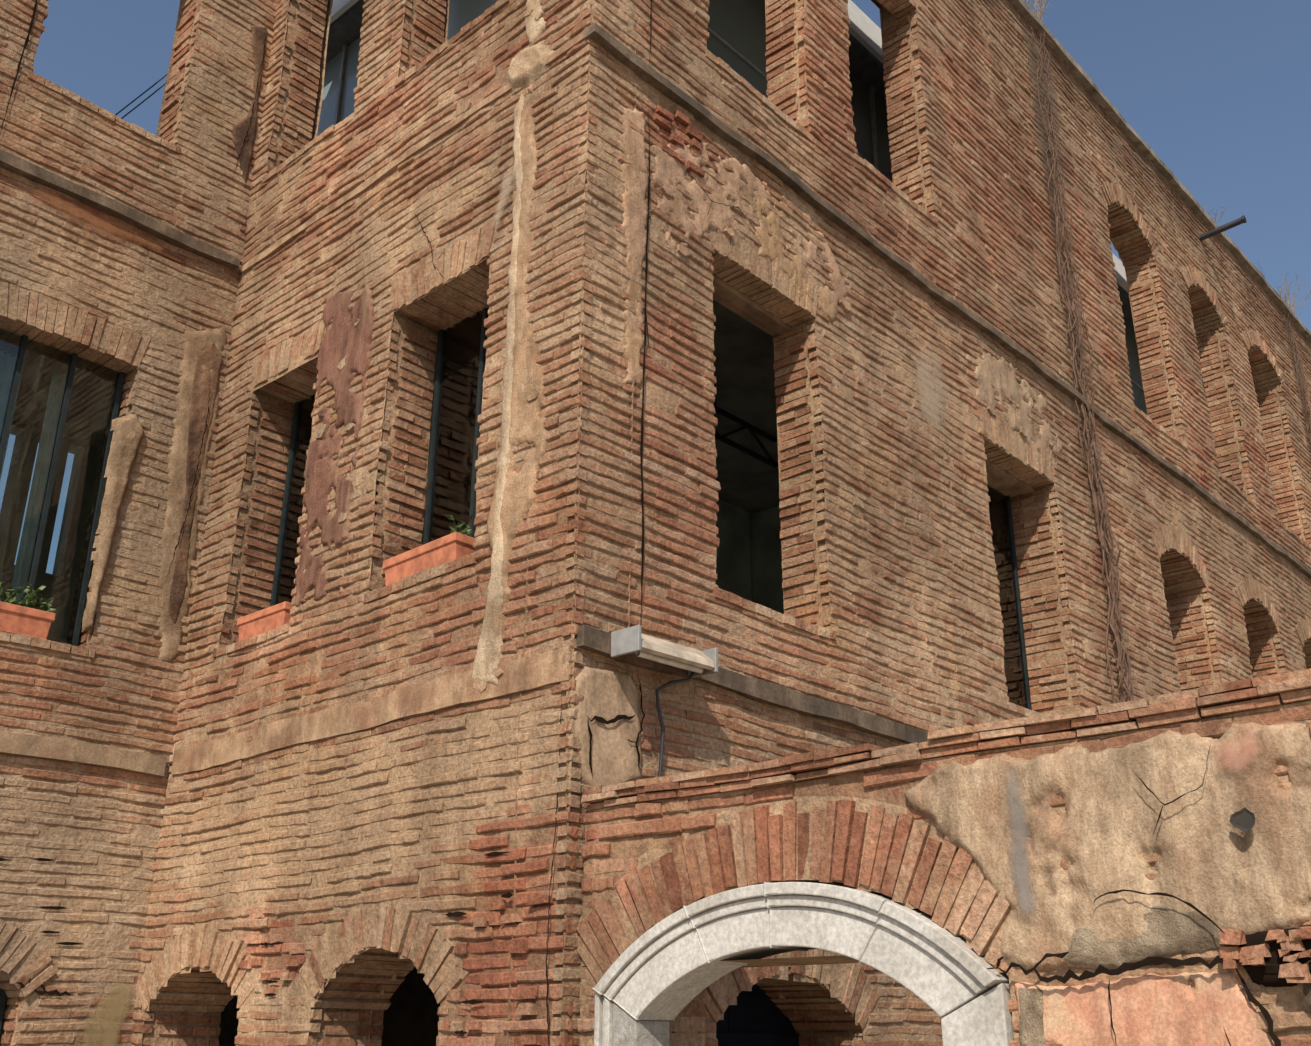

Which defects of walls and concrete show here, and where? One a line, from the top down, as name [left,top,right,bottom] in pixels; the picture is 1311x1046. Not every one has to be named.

crack [0,0,38,134]
crack [646,0,654,64]
spalling [652,105,705,178]
crack [685,167,763,240]
crack [640,147,650,625]
peeling [294,284,375,607]
crack [1137,748,1210,834]
crack [546,666,645,1046]
spalling [443,892,554,927]
spalling [440,999,499,1046]
spalling [514,988,538,1015]
spalling [520,1035,541,1045]